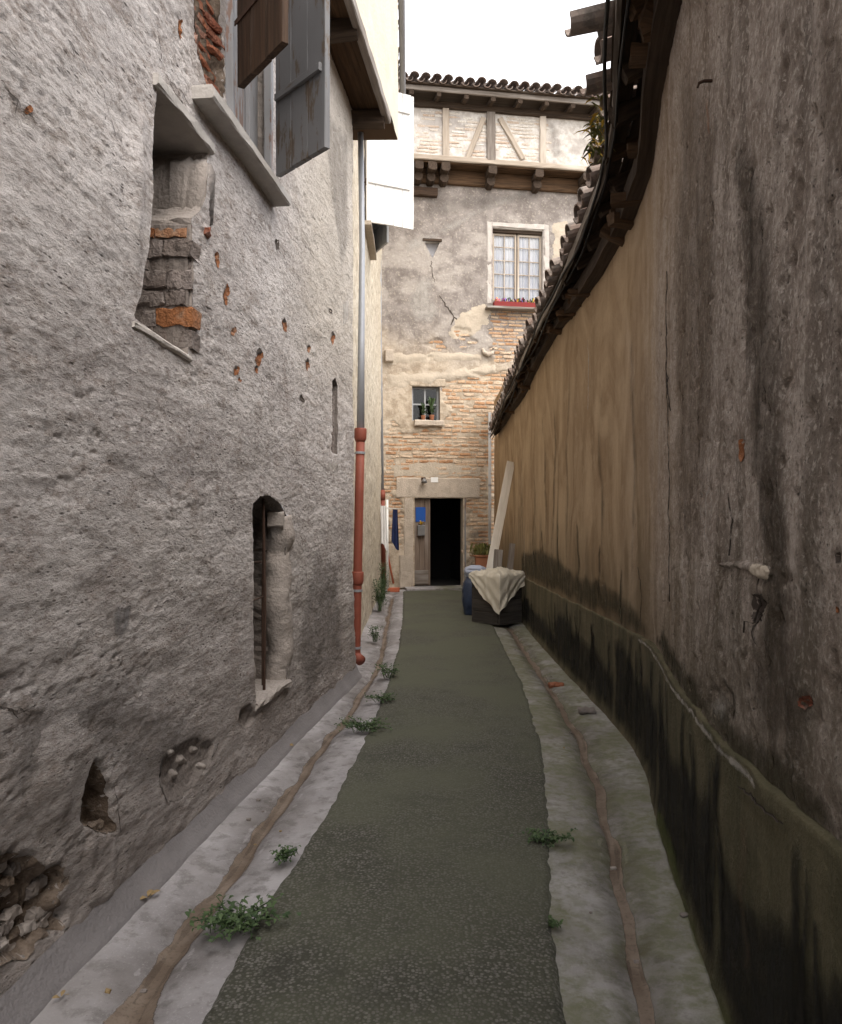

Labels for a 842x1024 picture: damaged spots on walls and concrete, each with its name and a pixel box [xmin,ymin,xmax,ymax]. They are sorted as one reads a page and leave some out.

spalling [178,0,225,97]
crack [431,261,457,325]
peeling [448,304,492,339]
spalling [254,348,264,374]
spalling [80,762,117,834]
spalling [159,738,214,803]
damp [506,628,655,1024]
damp [522,528,826,950]
spalling [0,853,69,966]